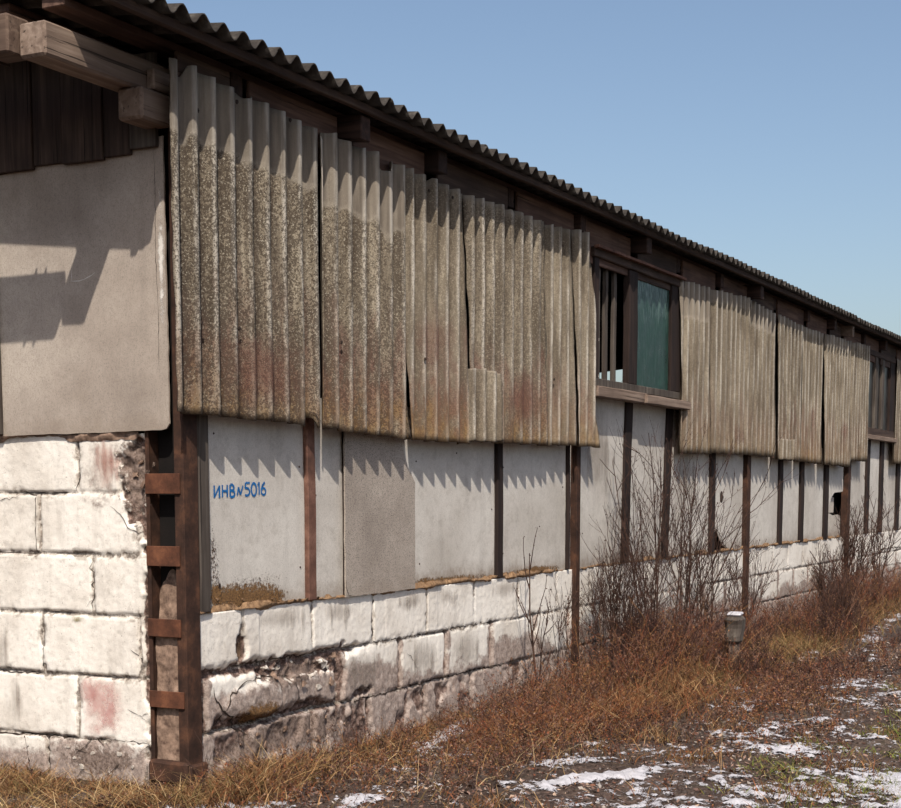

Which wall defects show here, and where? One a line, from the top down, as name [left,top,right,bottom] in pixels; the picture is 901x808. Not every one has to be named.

spalling [114,436,155,526]
crack [212,654,305,735]
spalling [258,652,337,690]
peeling [62,739,135,777]
spalling [215,712,352,762]